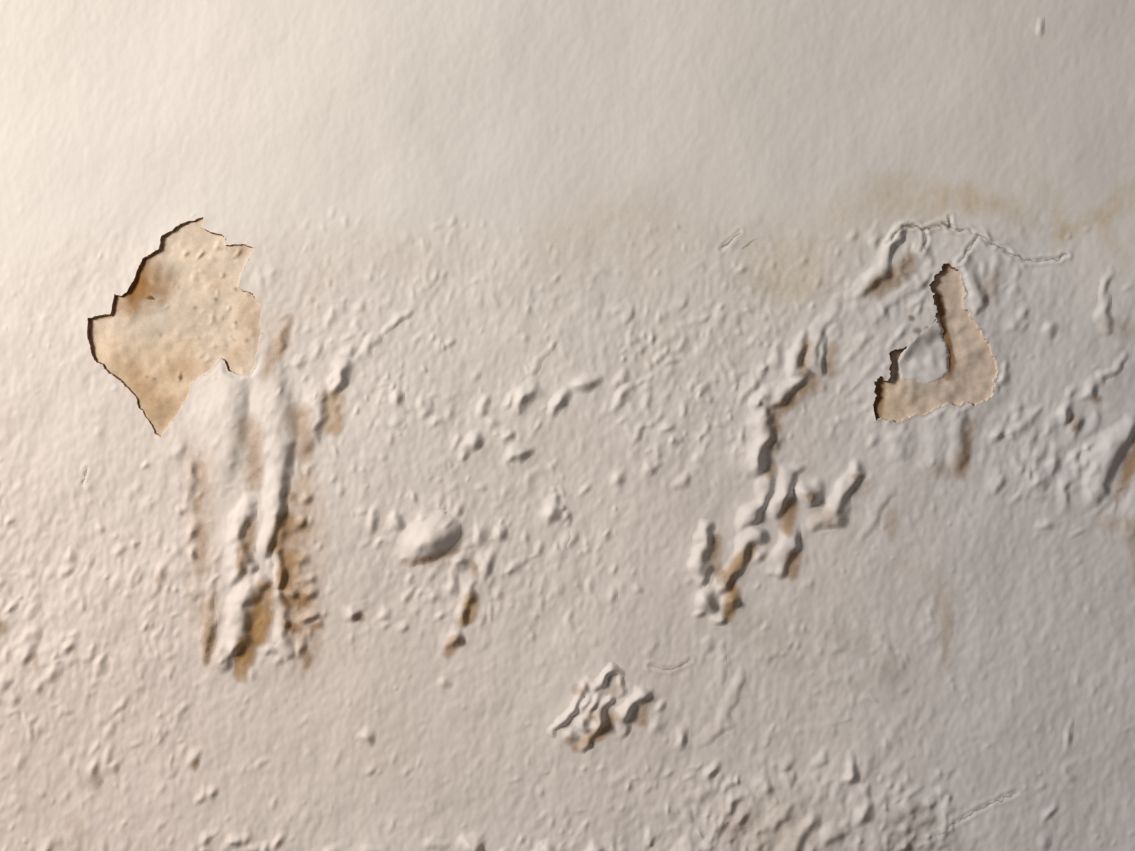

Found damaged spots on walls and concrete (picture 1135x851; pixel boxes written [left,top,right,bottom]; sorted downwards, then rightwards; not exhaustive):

crack [890,220,1062,262]
peeling [87,217,262,437]
peeling [873,263,998,423]